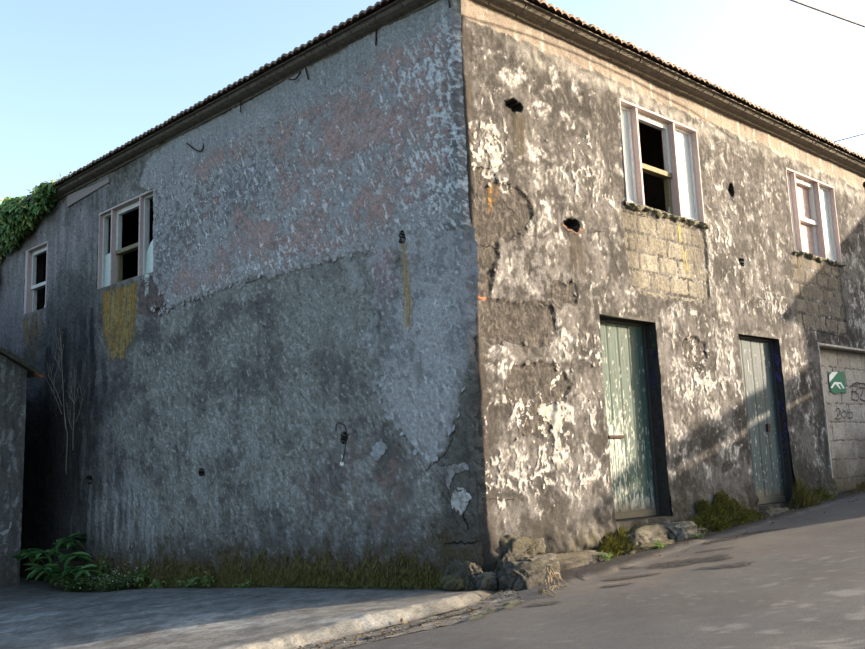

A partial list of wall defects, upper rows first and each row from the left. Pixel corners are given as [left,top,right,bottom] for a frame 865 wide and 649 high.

peeling [137,13,609,510]
rust [400,243,413,332]
flaking render [552,121,865,455]
flaking render [451,487,472,515]